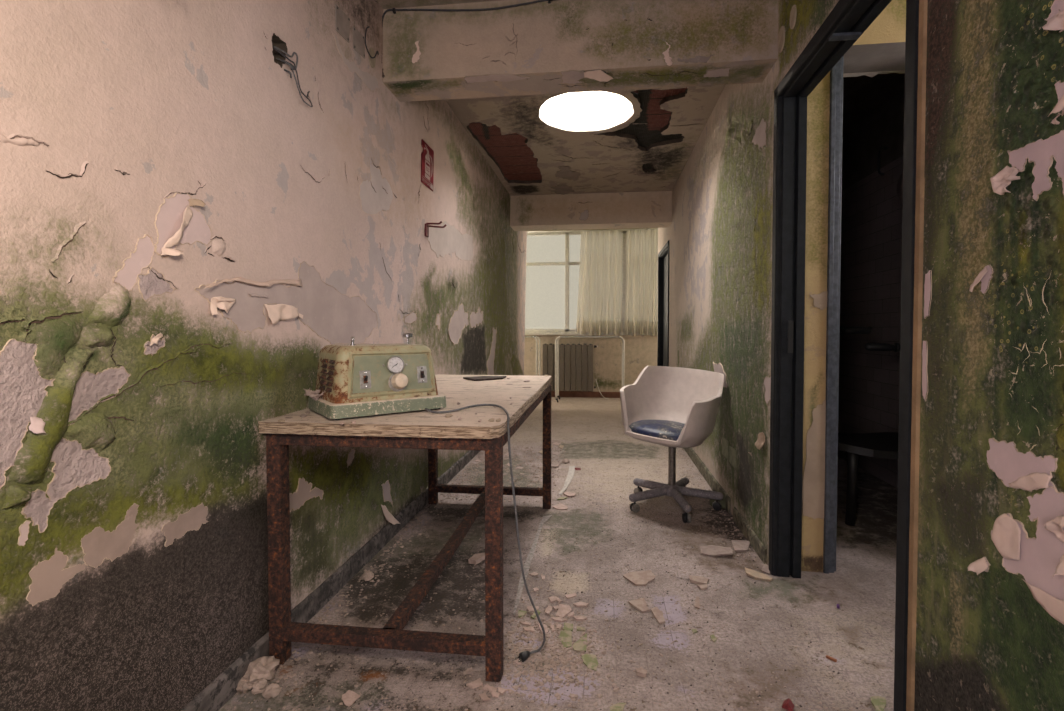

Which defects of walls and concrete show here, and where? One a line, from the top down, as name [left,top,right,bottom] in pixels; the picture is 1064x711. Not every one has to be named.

crack [7,133,89,179]
flaking render [593,87,688,173]
water stain [924,0,1010,384]
peeling [990,81,1064,201]
water stain [442,261,463,307]
peeling [0,339,55,489]
peeling [17,366,131,546]
peeling [26,503,139,606]
water stain [327,566,426,628]
water stain [291,485,485,610]
peeling [967,438,1064,625]
water stain [914,638,974,711]